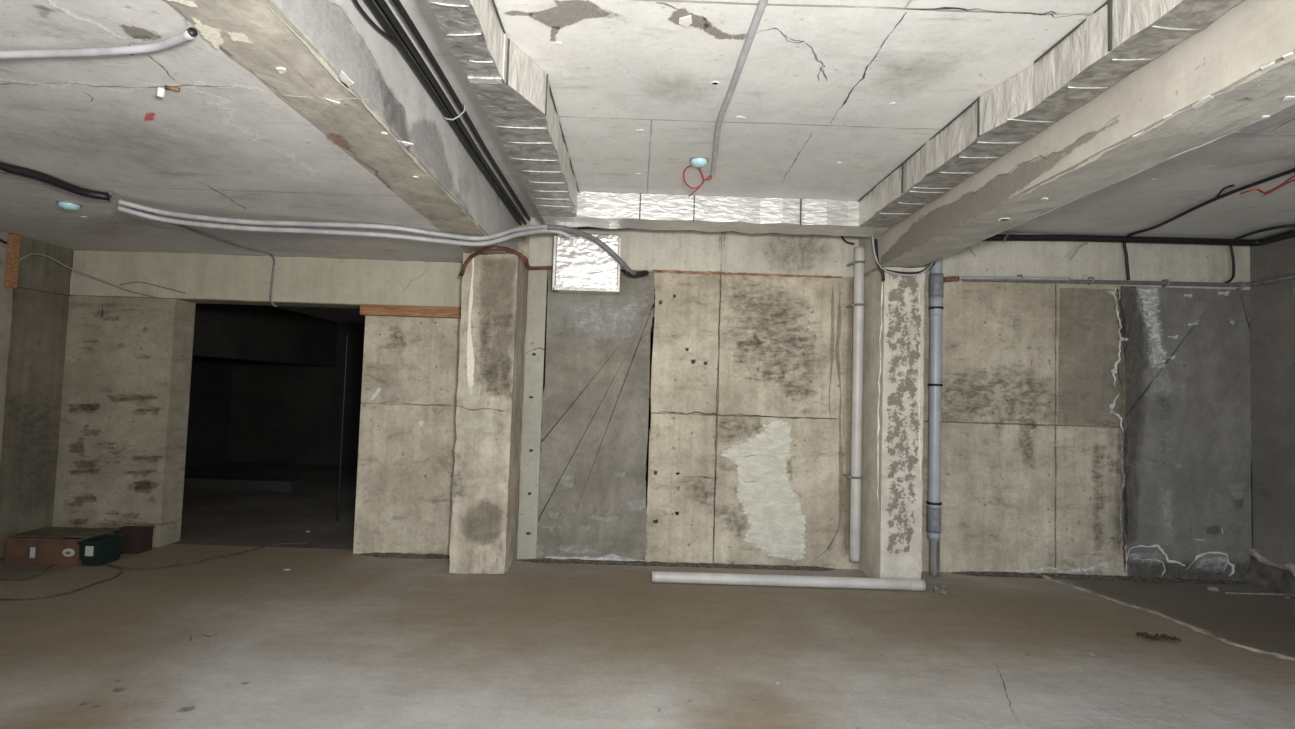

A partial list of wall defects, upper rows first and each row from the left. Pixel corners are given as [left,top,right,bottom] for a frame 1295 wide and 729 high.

peeling [167,0,254,55]
peeling [271,9,497,246]
spalling [655,2,746,40]
crack [760,7,1084,178]
peeling [466,252,514,403]
peeling [877,274,922,554]
flaking render [1242,548,1295,599]